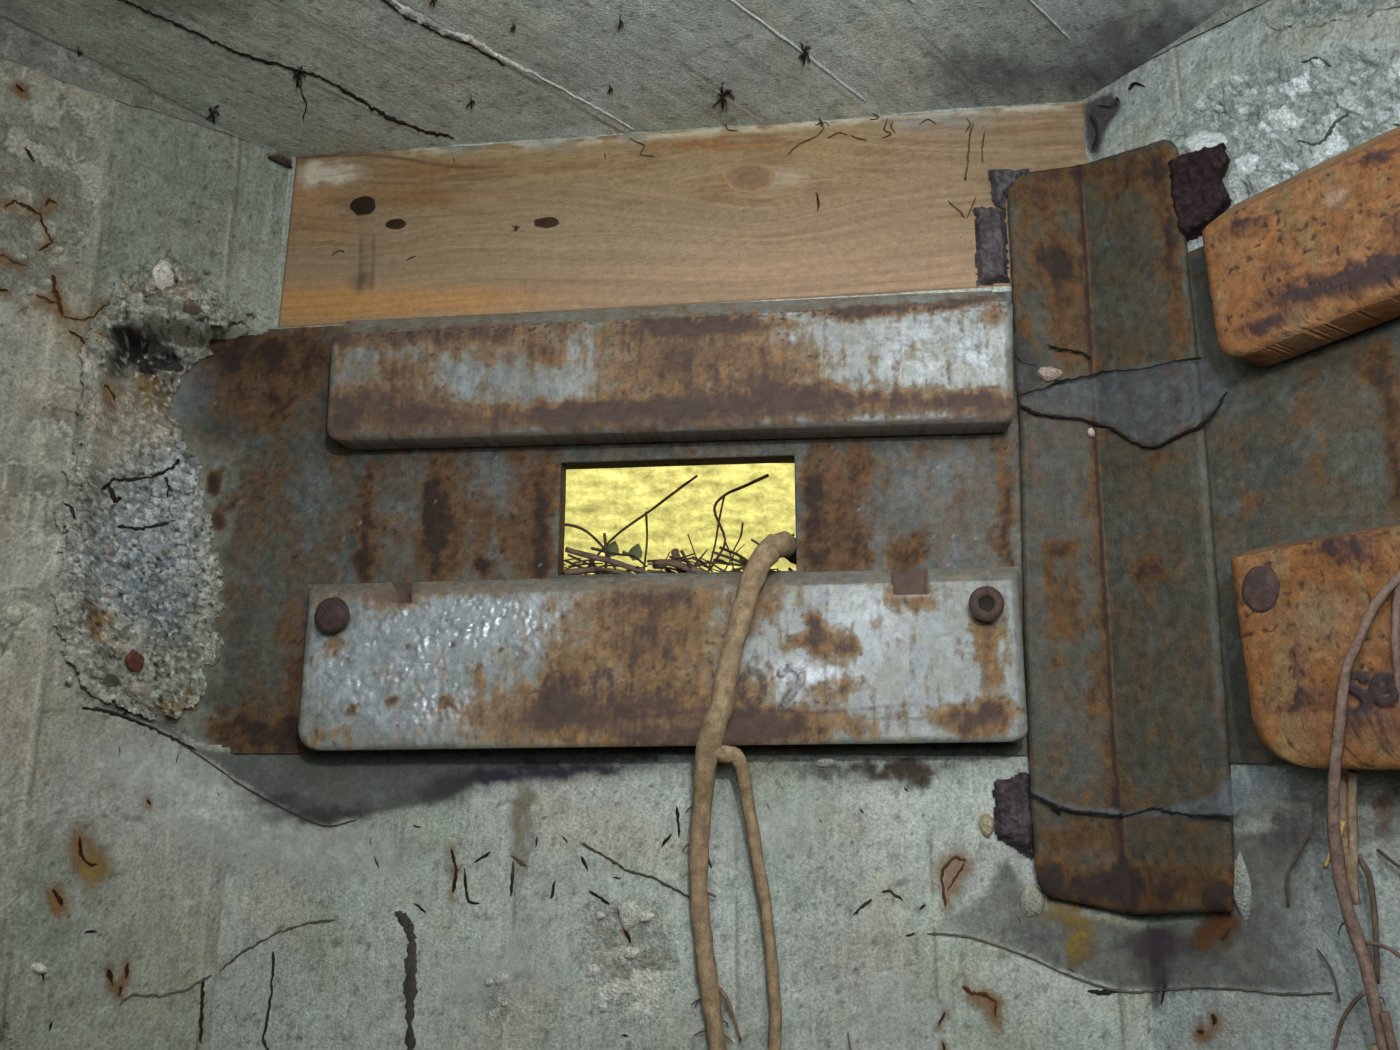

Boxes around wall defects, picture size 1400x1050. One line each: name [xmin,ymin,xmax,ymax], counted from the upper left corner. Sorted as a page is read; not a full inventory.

crack [118,0,454,139]
crack [381,0,505,66]
spalling [50,250,257,720]
crack [119,919,336,1050]